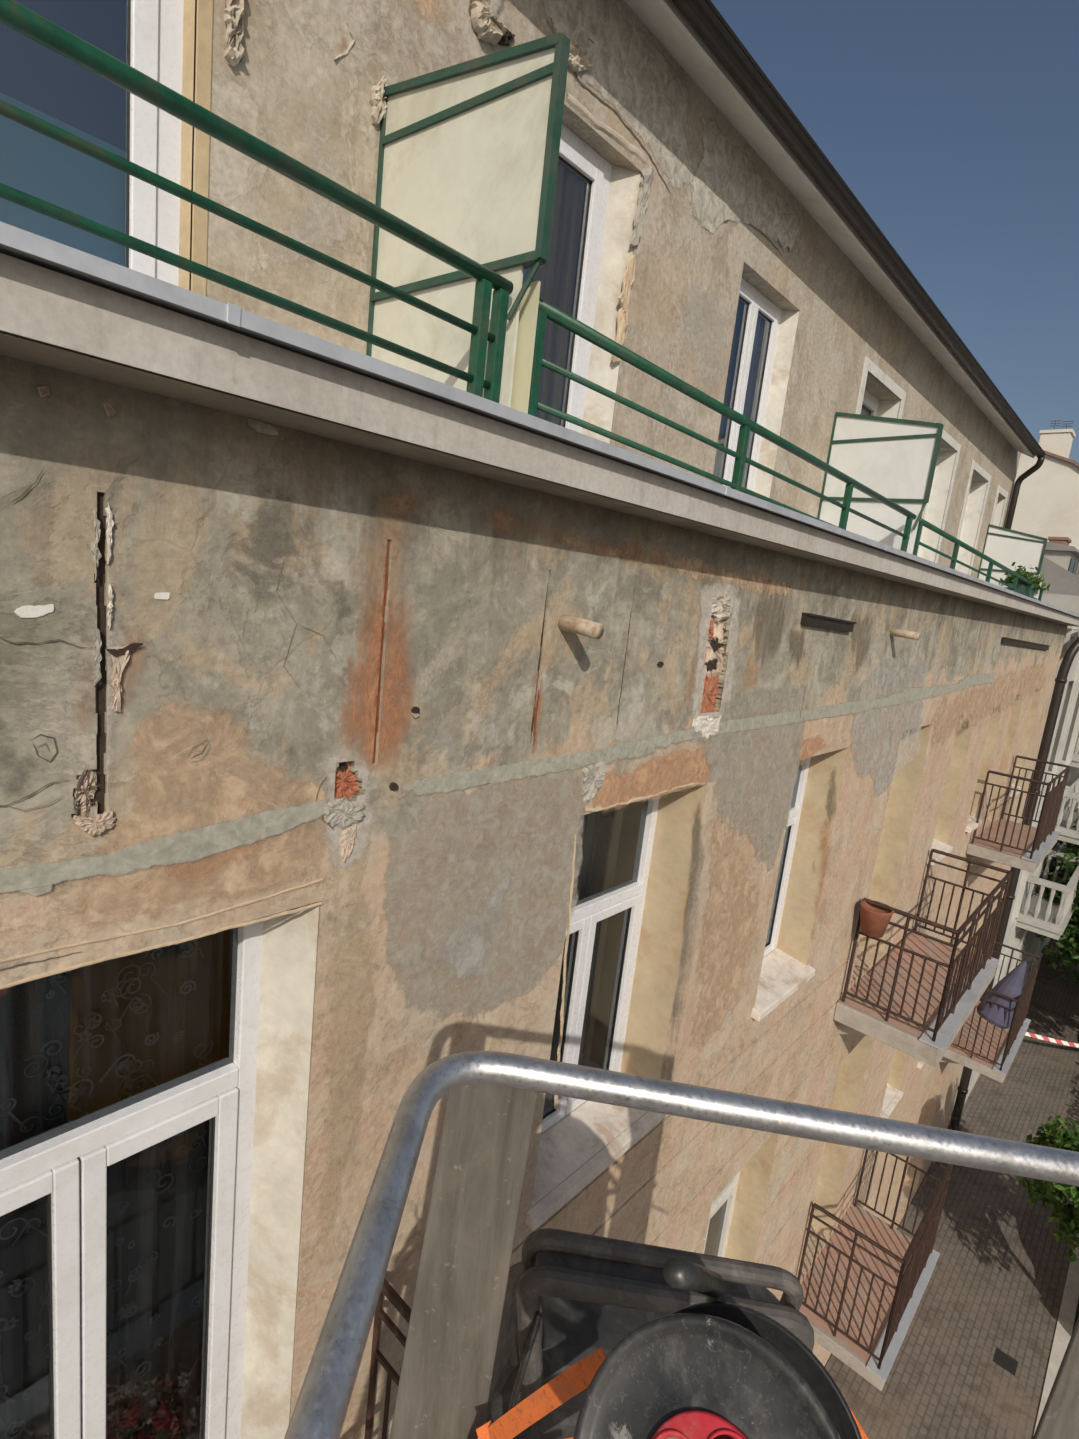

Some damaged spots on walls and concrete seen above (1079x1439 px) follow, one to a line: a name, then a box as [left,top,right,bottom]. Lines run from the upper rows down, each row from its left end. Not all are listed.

flaking render [223,0,245,67]
flaking render [469,0,515,46]
flaking render [541,0,801,363]
crack [0,492,143,836]
crack [188,740,211,763]
flaking render [79,702,373,925]
crack [276,555,337,692]
flaking render [581,539,792,808]